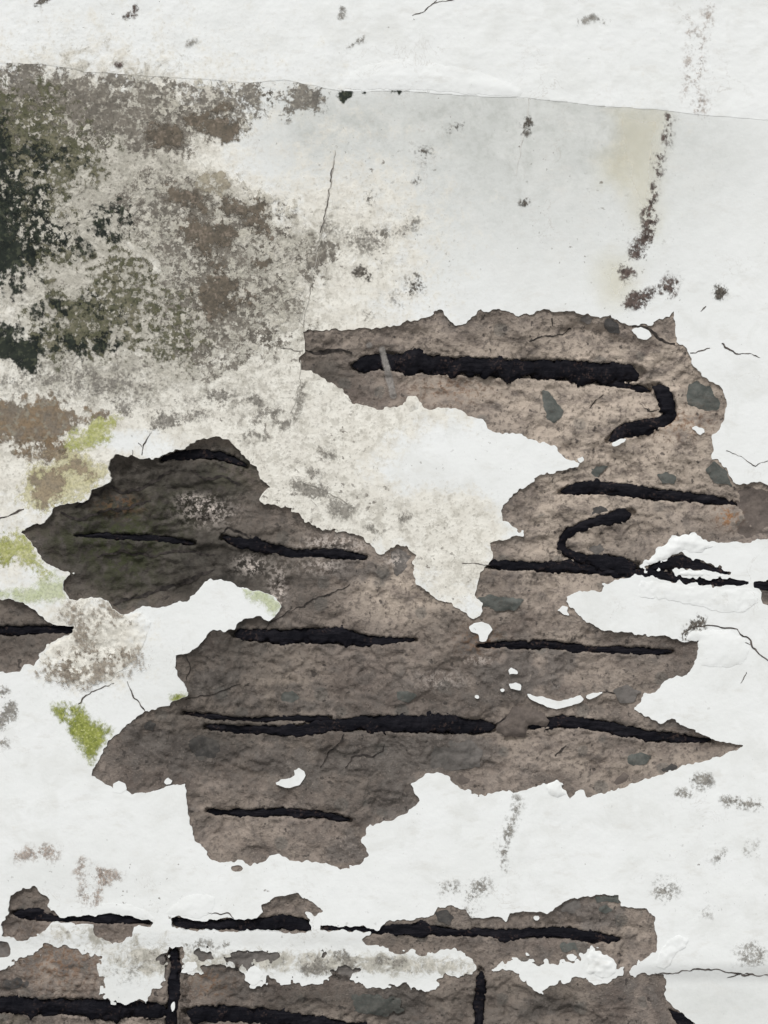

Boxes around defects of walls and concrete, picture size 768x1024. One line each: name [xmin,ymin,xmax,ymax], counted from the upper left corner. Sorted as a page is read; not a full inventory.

leakage [0,63,340,511]
crack [283,151,336,410]
crack [632,325,760,358]
spalling [0,309,768,872]
crack [682,618,768,683]
spalling [0,886,695,1024]
crack [655,968,768,978]